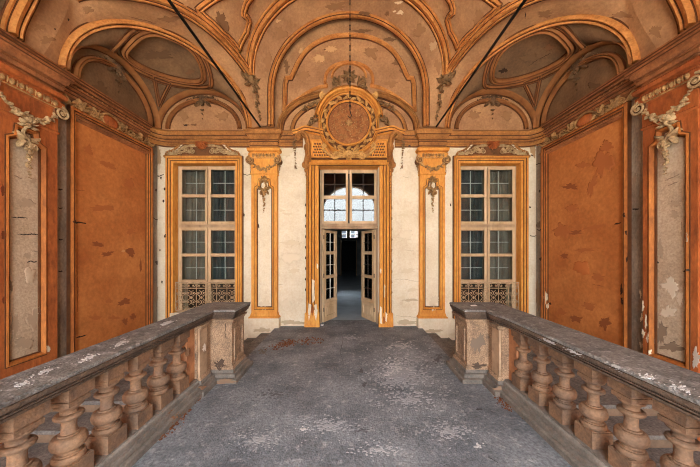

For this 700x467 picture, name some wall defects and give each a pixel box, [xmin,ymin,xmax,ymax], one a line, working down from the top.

peeling [305,204,318,319]
spalling [659,276,683,318]
peeling [692,346,700,369]